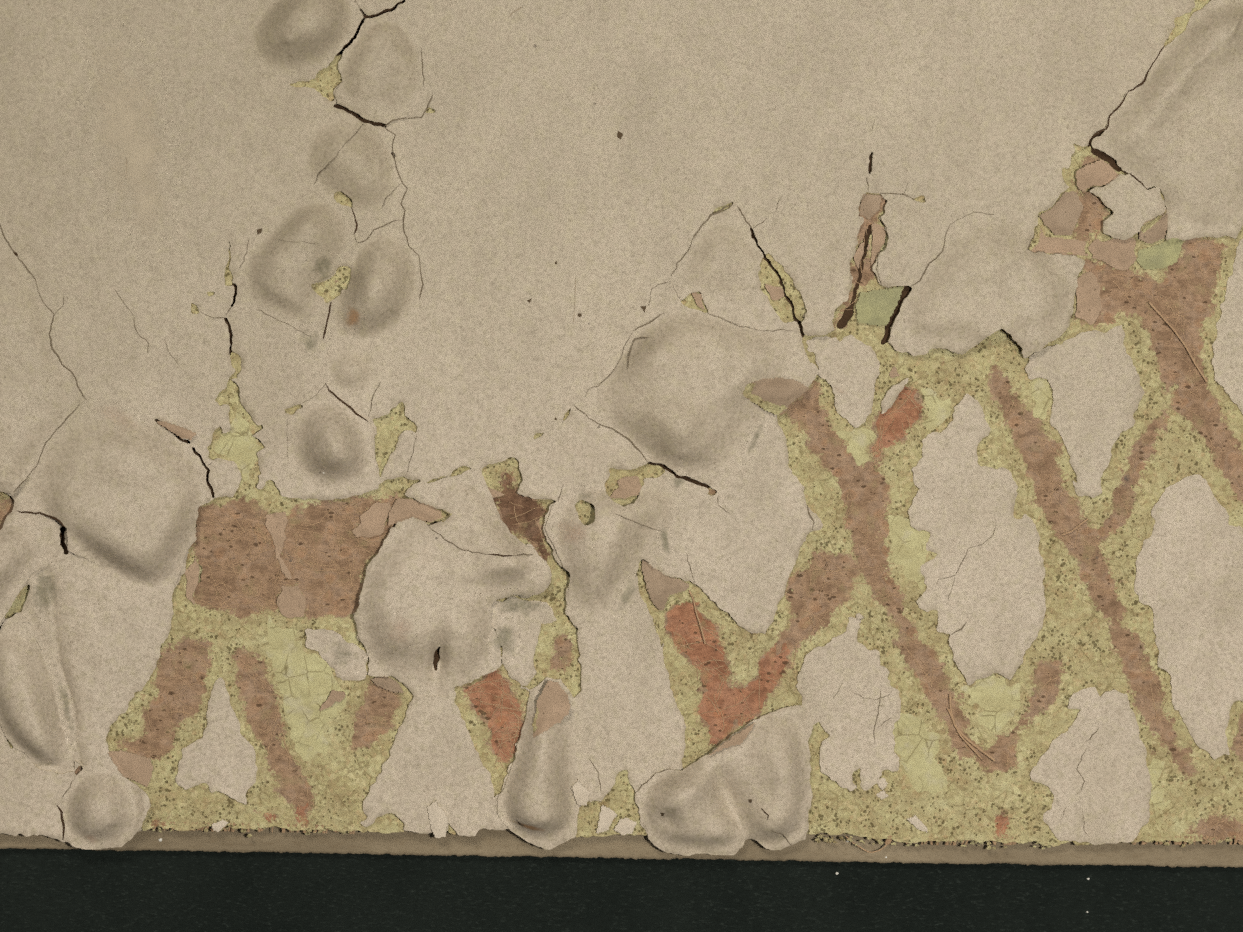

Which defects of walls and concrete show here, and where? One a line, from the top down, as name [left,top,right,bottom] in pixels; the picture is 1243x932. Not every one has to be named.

peeling [290,55,342,101]
crack [337,0,405,56]
crack [314,48,433,300]
crack [837,225,871,329]
crack [881,212,993,345]
crack [0,225,86,554]
crack [574,196,804,514]
peeling [575,500,595,525]
peeling [605,464,665,506]
peeling [636,144,1243,847]
peeling [106,352,581,838]
peeling [571,770,647,838]